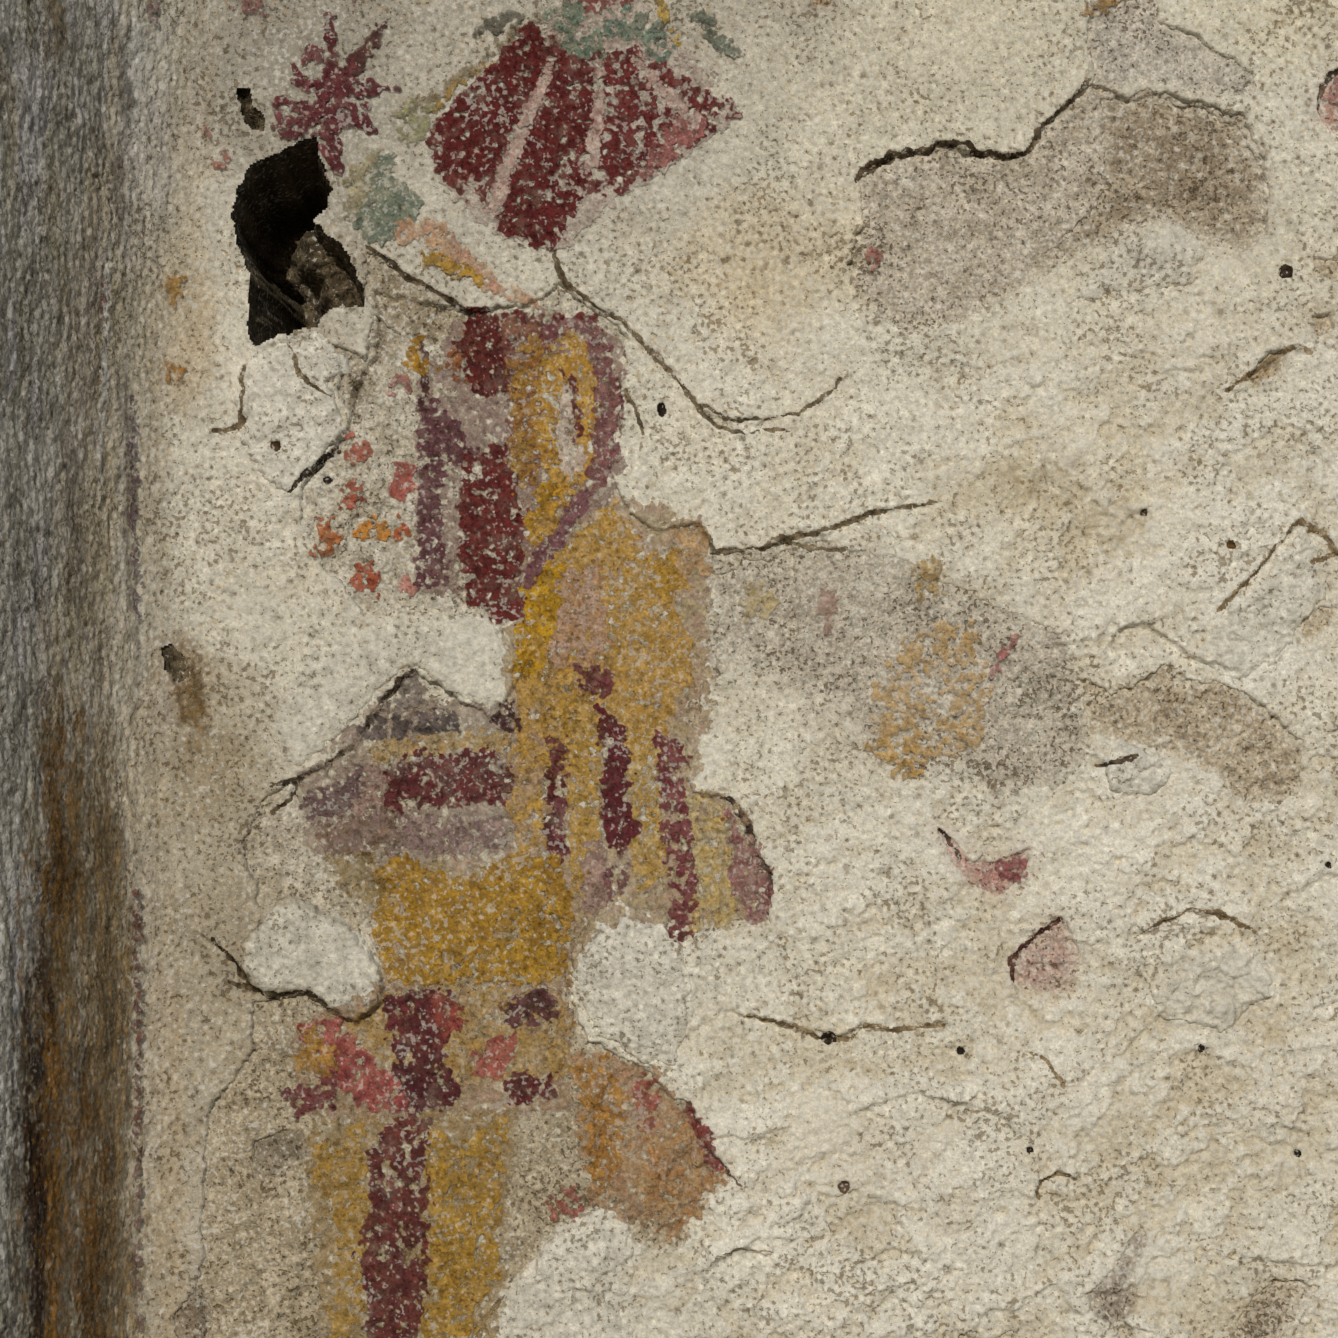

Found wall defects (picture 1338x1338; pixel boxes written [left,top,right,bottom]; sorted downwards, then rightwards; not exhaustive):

crack [854,76,1092,183]
spalling [1318,78,1338,133]
spalling [1314,259,1338,281]
crack [552,230,842,436]
crack [708,499,938,555]
spalling [174,231,1304,1338]
rust [5,676,150,1338]
spalling [1236,1278,1317,1338]